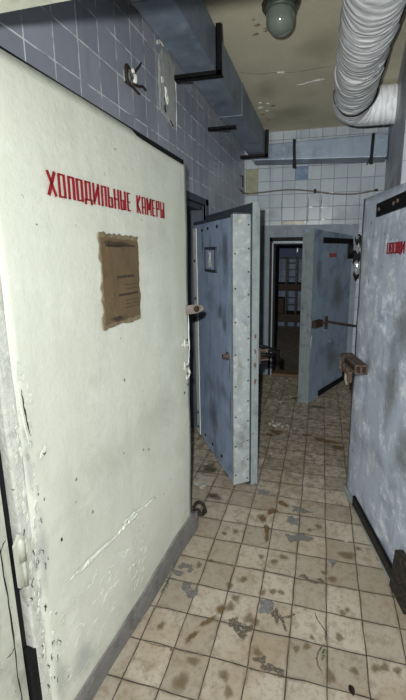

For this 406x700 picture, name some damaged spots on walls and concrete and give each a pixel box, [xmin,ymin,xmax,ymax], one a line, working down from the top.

spalling [156,39,177,130]
peeling [13,361,61,700]
spalling [285,506,313,542]
spalling [171,563,198,598]
spalling [228,617,253,639]
spalling [258,599,295,630]
spalling [252,656,284,677]